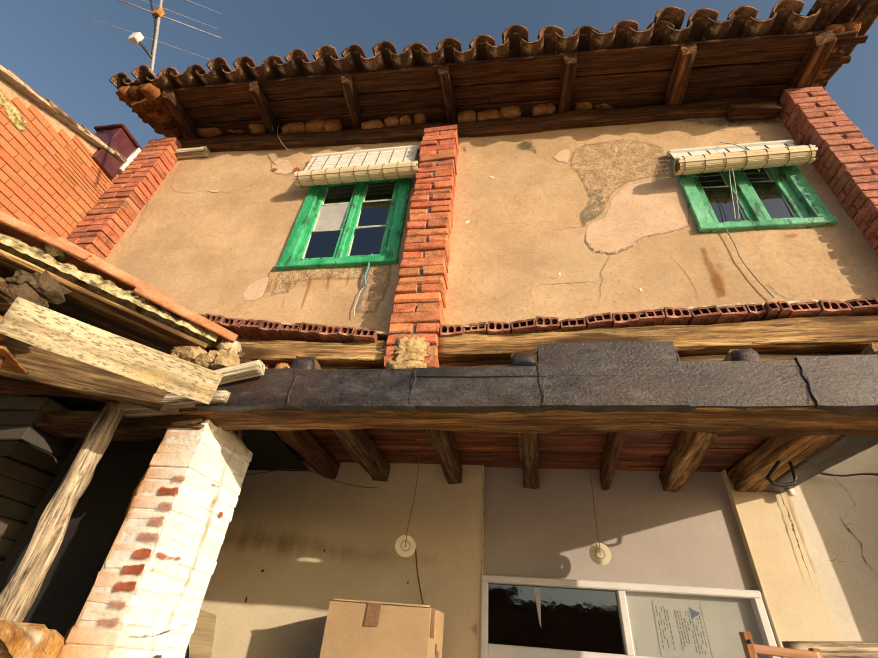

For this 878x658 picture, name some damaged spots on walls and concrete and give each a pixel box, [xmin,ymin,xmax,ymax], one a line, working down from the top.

flaking render [554,139,689,255]
spalling [243,264,390,313]
crack [780,493,812,583]